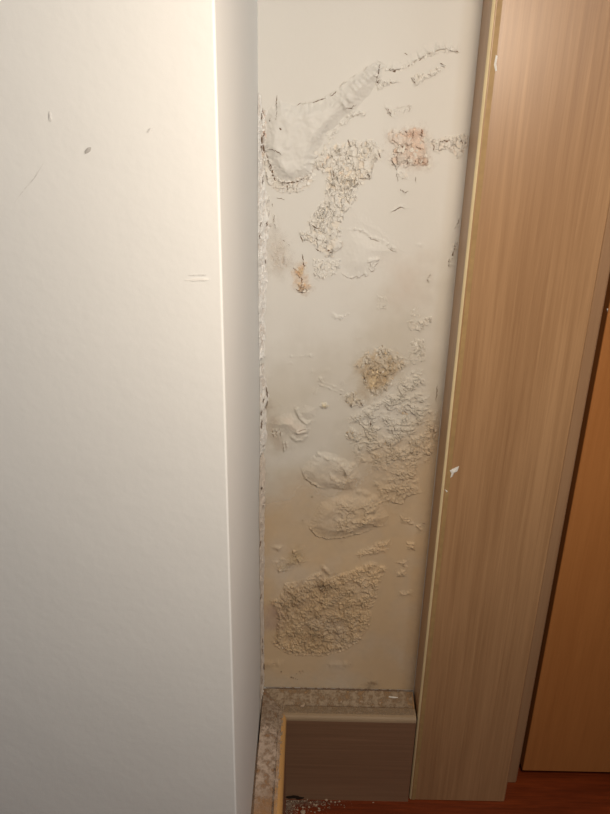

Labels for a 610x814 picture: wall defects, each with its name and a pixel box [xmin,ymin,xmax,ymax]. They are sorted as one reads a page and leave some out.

peeling [293,39,469,295]
flaking render [352,341,412,402]
water stain [263,435,439,690]